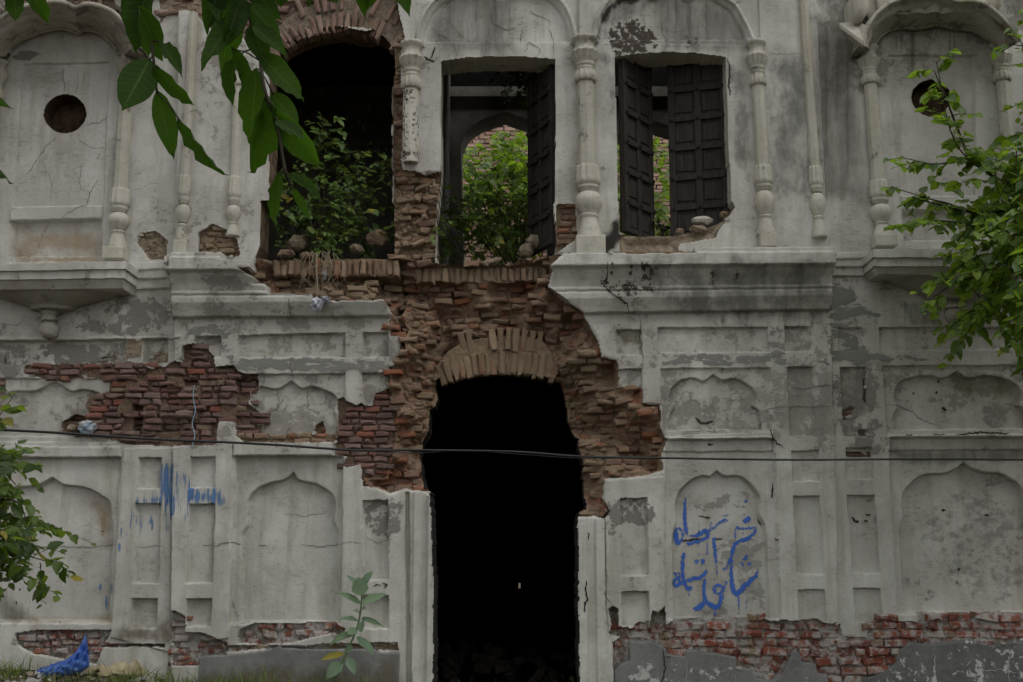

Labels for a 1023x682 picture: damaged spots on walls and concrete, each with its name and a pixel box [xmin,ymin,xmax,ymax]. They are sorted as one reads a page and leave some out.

spalling [154,0,211,29]
spalling [274,0,330,26]
damp [597,0,659,61]
spalling [387,0,442,263]
flaking render [137,231,168,260]
flaking render [199,224,240,258]
flaking render [0,295,399,480]
peeling [605,496,656,536]
flaking render [12,610,399,667]
flaking render [608,539,1023,682]